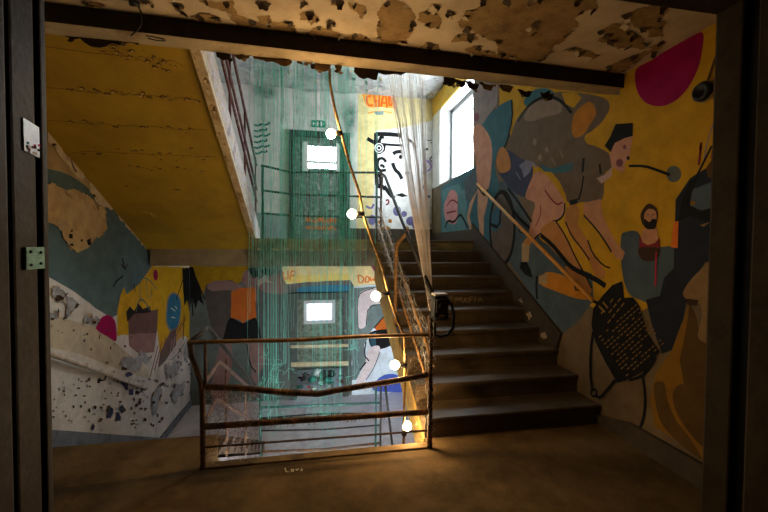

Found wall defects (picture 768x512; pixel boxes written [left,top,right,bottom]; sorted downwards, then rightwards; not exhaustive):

peeling [45,36,186,73]
peeling [172,0,603,63]
peeling [597,5,669,76]
flaking render [48,132,213,253]
peeling [50,286,80,333]
peeling [83,313,109,351]
peeling [52,336,192,430]